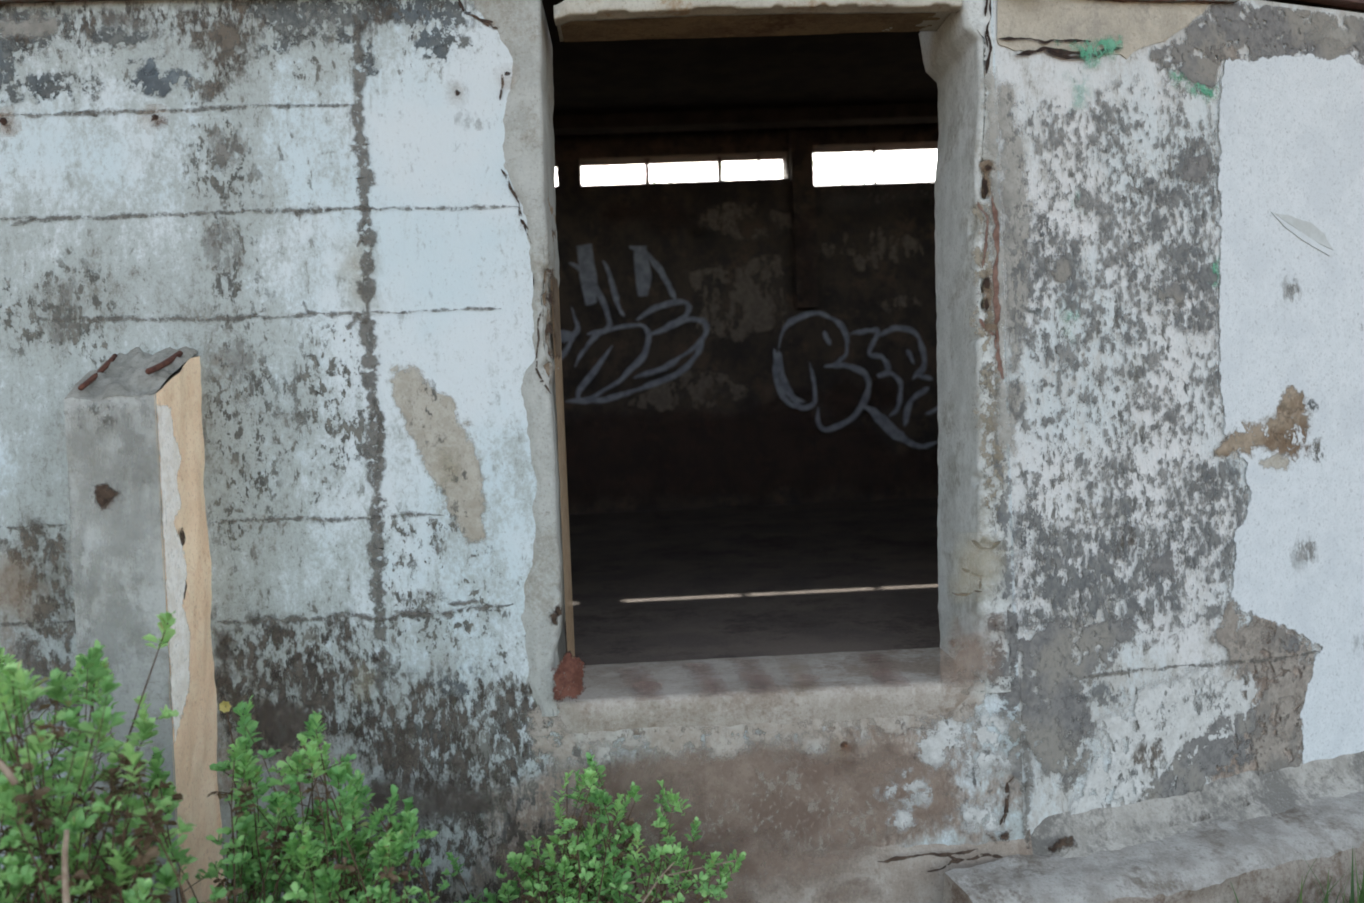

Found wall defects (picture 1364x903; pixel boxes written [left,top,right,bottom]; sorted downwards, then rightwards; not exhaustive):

rust [94,484,119,509]
peeling [390,365,486,543]
peeling [626,1,1364,854]
damp [385,516,490,656]
rust [551,651,586,701]
damp [214,617,998,903]
crack [877,732,1034,872]